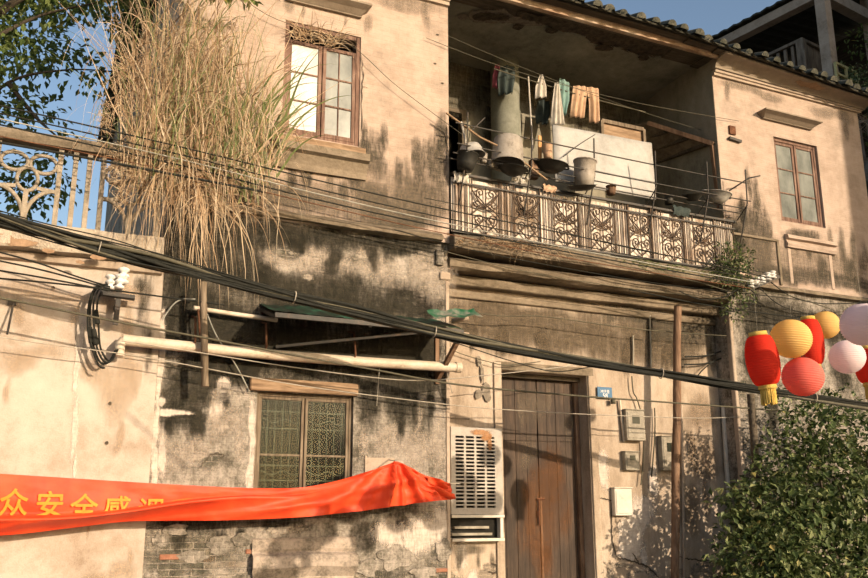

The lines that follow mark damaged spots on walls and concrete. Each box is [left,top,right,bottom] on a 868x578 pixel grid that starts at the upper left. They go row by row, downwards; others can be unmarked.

peeling [512,10,673,61]
damp [448,62,491,141]
damp [565,96,635,133]
damp [160,116,716,370]
damp [726,174,868,292]
damp [144,273,446,488]
rust [472,429,492,450]
spalling [144,524,253,578]
spalling [267,523,310,534]
spalling [356,537,463,578]
crack [600,497,659,578]
spalling [607,547,664,578]